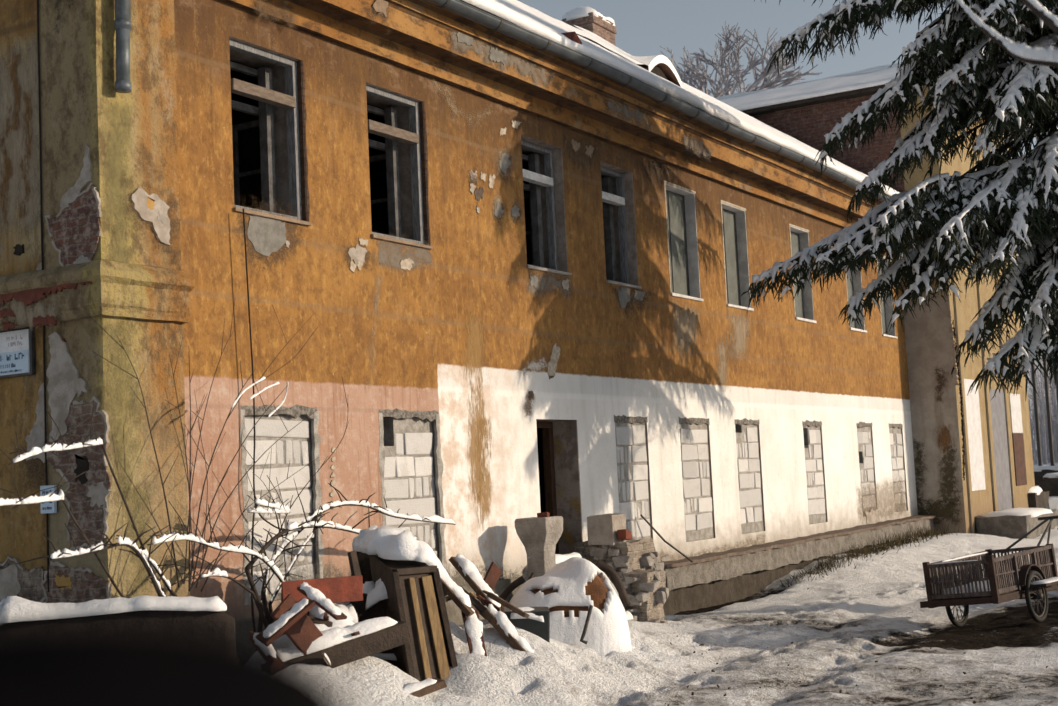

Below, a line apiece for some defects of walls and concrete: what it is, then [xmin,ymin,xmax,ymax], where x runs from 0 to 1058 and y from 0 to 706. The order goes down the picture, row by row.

leakage [0,41,40,233]
peeling [45,144,102,267]
peeling [128,183,180,261]
peeling [345,237,431,273]
peeling [469,170,496,214]
peeling [522,343,560,379]
spalling [0,281,112,550]
spalling [0,556,111,603]